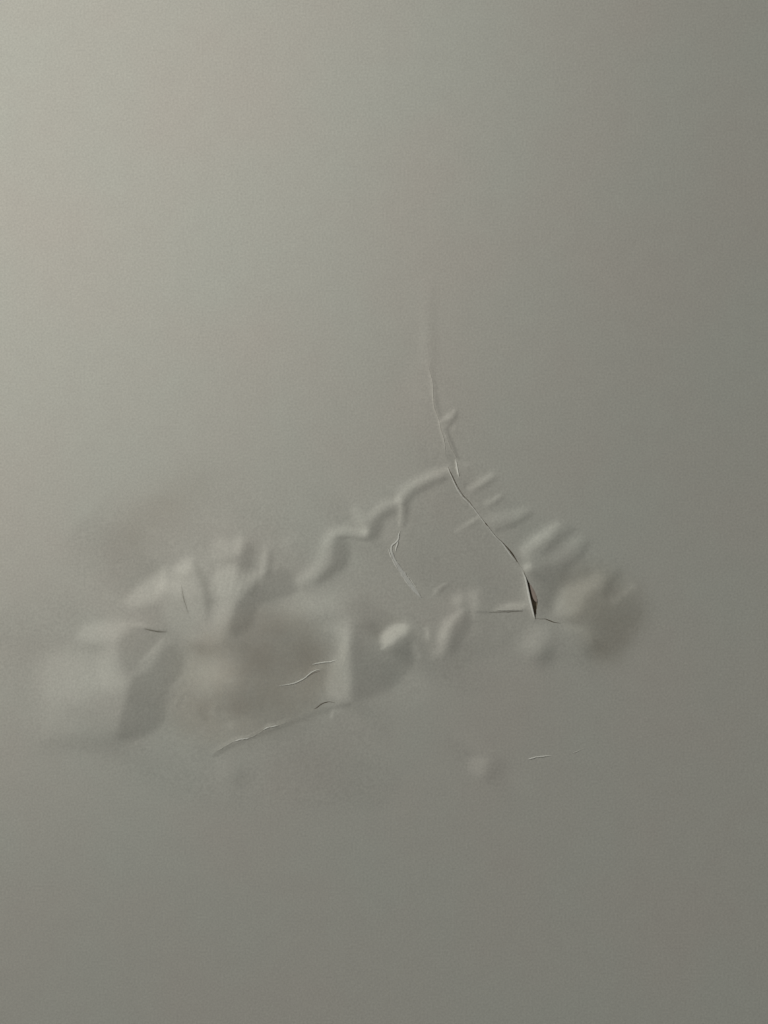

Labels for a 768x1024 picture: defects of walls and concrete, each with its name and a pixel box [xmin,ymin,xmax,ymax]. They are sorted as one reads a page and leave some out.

crack [280,660,335,686]